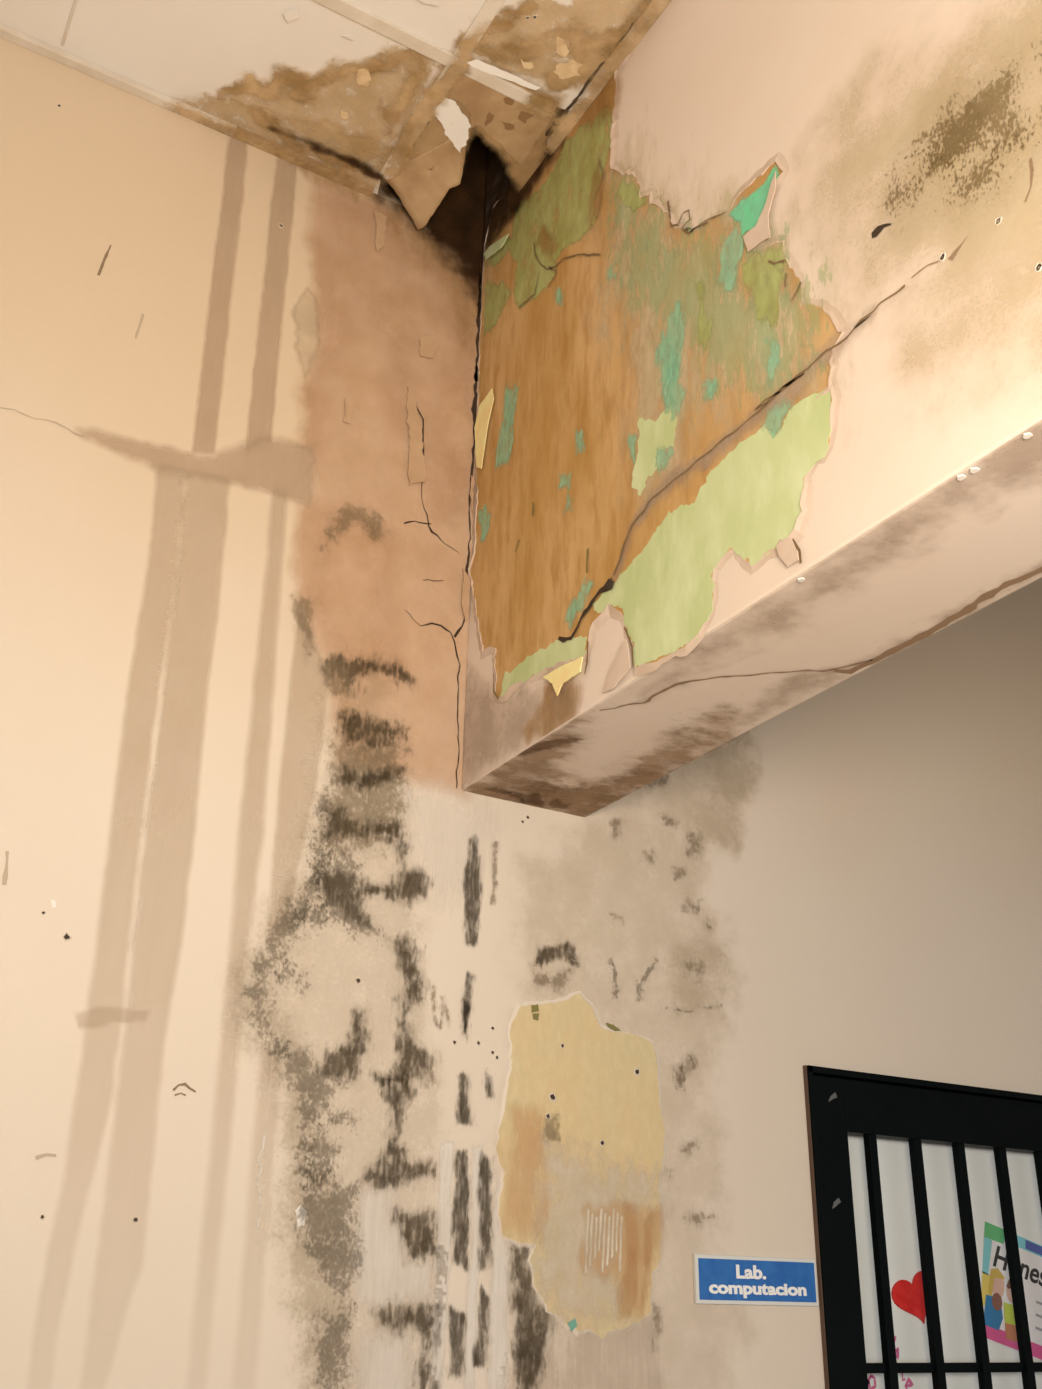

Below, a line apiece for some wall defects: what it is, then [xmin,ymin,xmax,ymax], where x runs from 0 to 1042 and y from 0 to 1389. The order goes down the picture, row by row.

crack [0,407,84,437]
water stain [87,0,731,926]
peeling [461,50,851,704]
crack [558,236,967,643]
crack [871,223,891,238]
water stain [834,0,1042,303]
water stain [316,1012,366,1080]
water stain [360,939,550,1389]
water stain [464,841,482,946]
water stain [536,942,577,984]
peeling [494,990,667,1342]